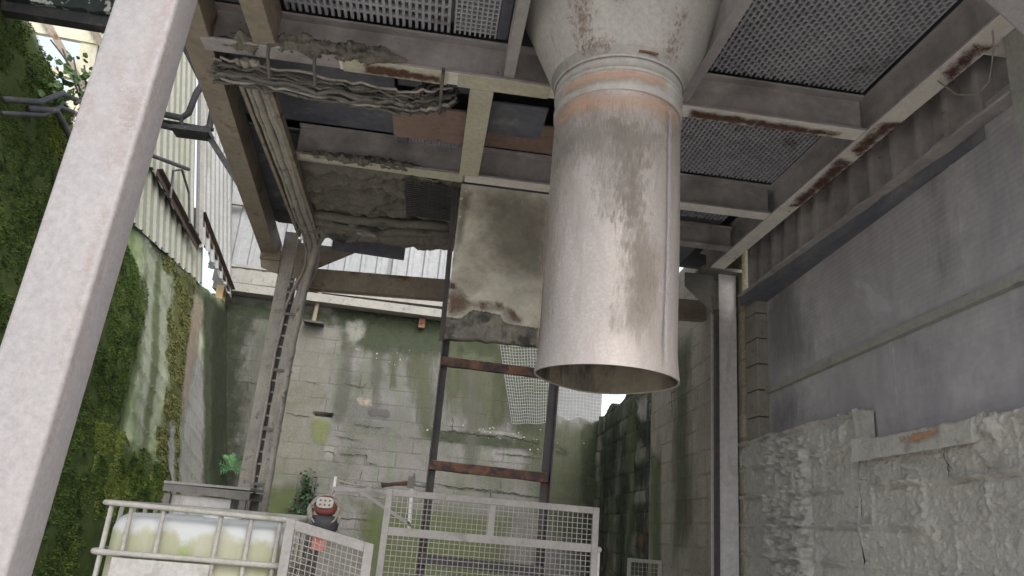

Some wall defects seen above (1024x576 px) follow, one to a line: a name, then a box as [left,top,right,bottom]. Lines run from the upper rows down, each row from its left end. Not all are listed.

corrosion [943,44,993,85]
corrosion [688,111,840,137]
corrosion [789,122,900,207]
water stain [120,236,207,468]
water stain [335,322,362,420]
water stain [168,353,206,497]
water stain [598,421,646,576]